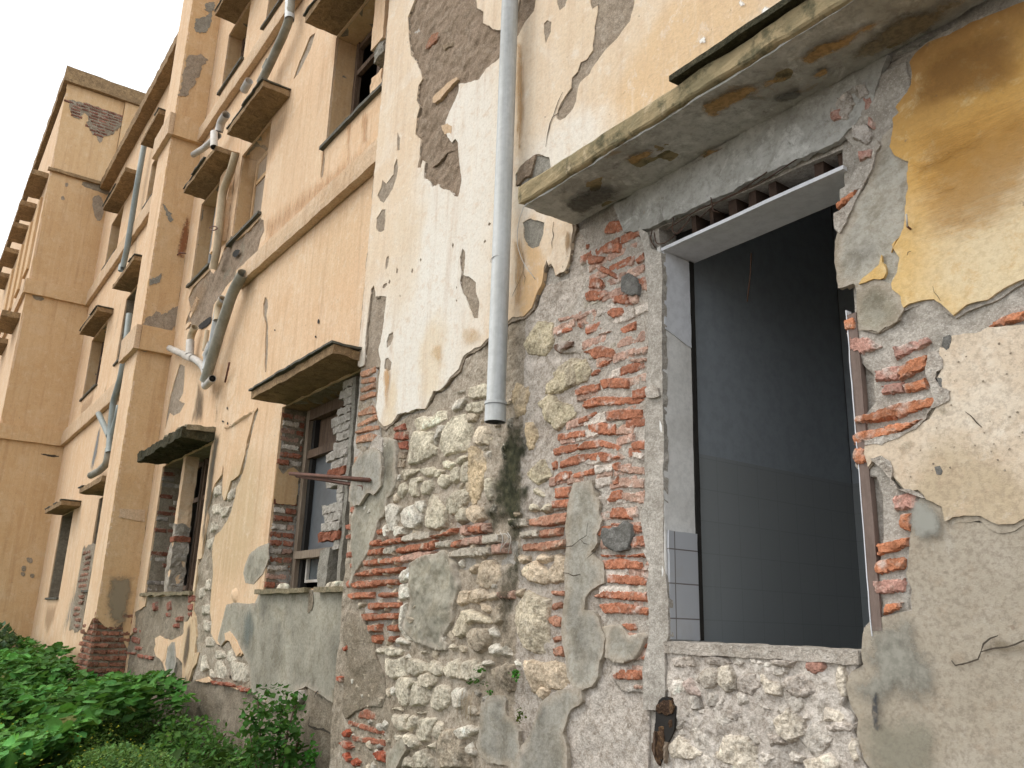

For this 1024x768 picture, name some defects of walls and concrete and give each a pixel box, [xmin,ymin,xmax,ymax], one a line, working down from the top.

flaking render [64,99,123,143]
peeling [178,53,208,97]
peeling [410,0,501,197]
peeling [517,0,536,36]
peeling [557,0,634,120]
flaking render [828,62,911,234]
flaking render [69,218,661,768]
leakage [487,428,528,613]
flaking render [844,285,1024,616]
crack [951,635,1024,666]